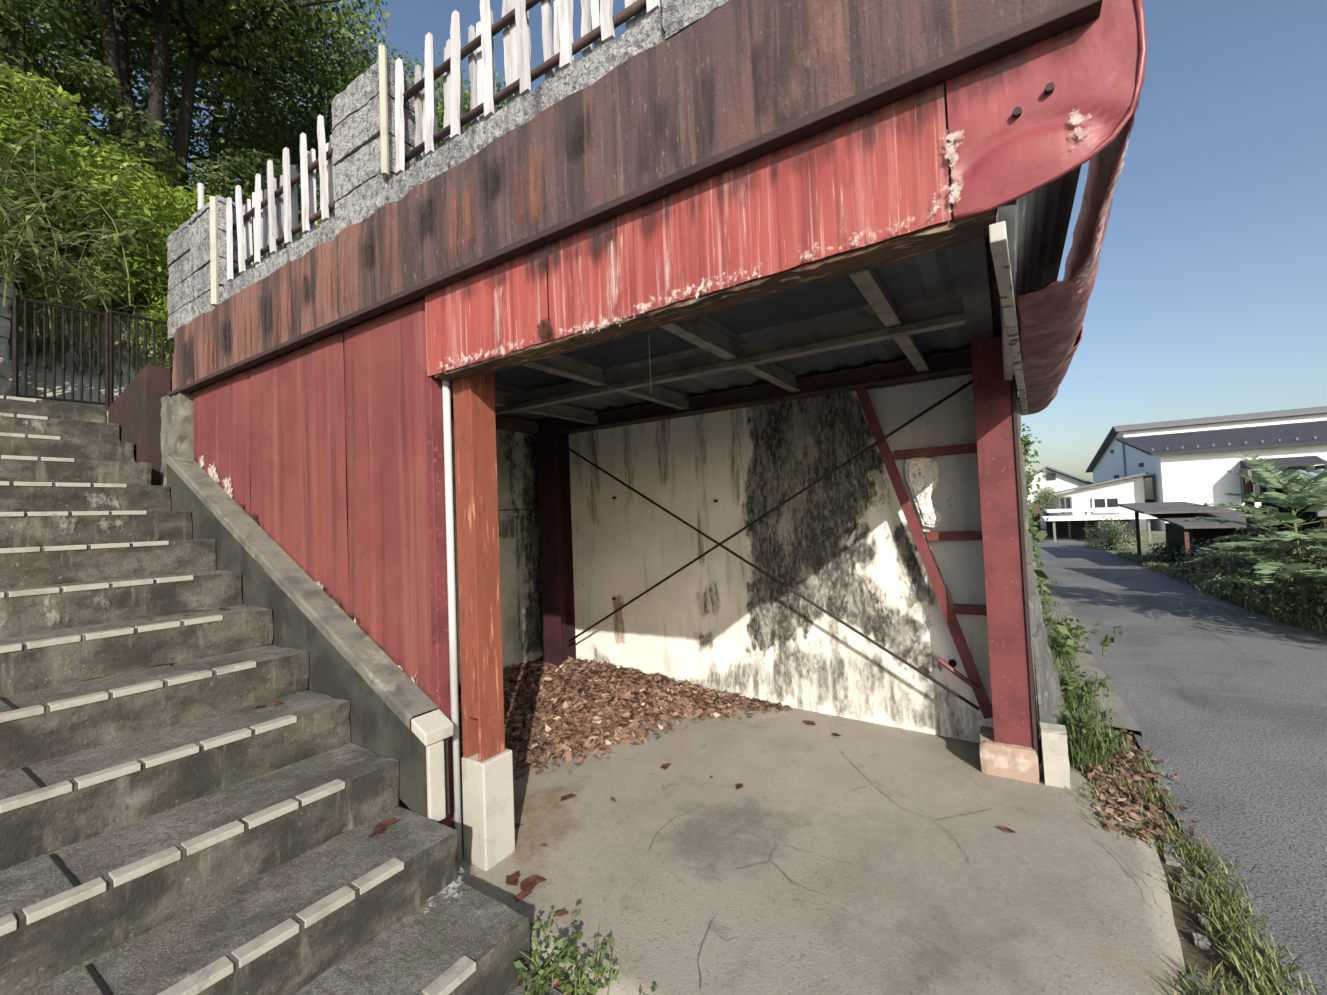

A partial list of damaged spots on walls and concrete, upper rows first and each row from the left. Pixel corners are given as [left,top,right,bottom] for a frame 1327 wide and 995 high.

peeling [1068,109,1094,148]
peeling [799,130,964,259]
peeling [559,266,760,337]
peeling [439,340,532,370]
spalling [905,457,942,528]
damp [501,431,543,660]
damp [691,392,963,738]
peeling [854,568,932,639]
crack [840,749,994,866]